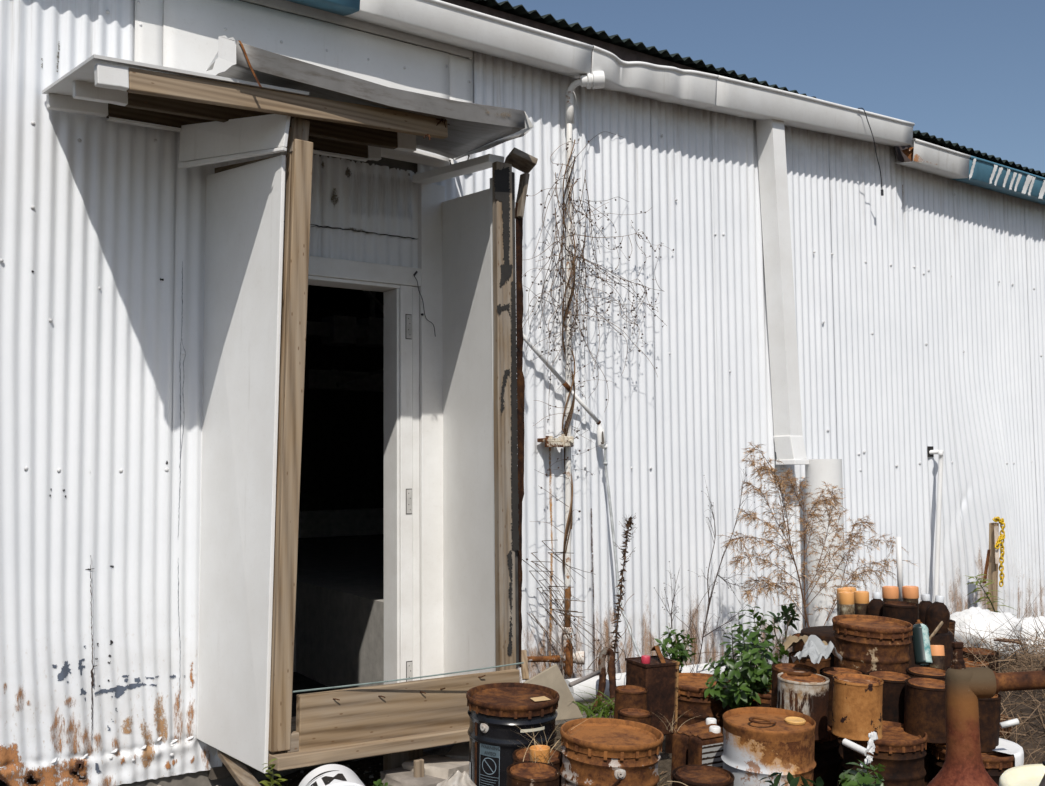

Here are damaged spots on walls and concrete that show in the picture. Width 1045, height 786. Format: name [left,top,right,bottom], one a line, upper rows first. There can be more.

corrosion [515,202,668,680]
peeling [53,640,113,683]
crack [88,555,96,753]
corrosion [0,663,194,786]
peeling [80,675,185,731]